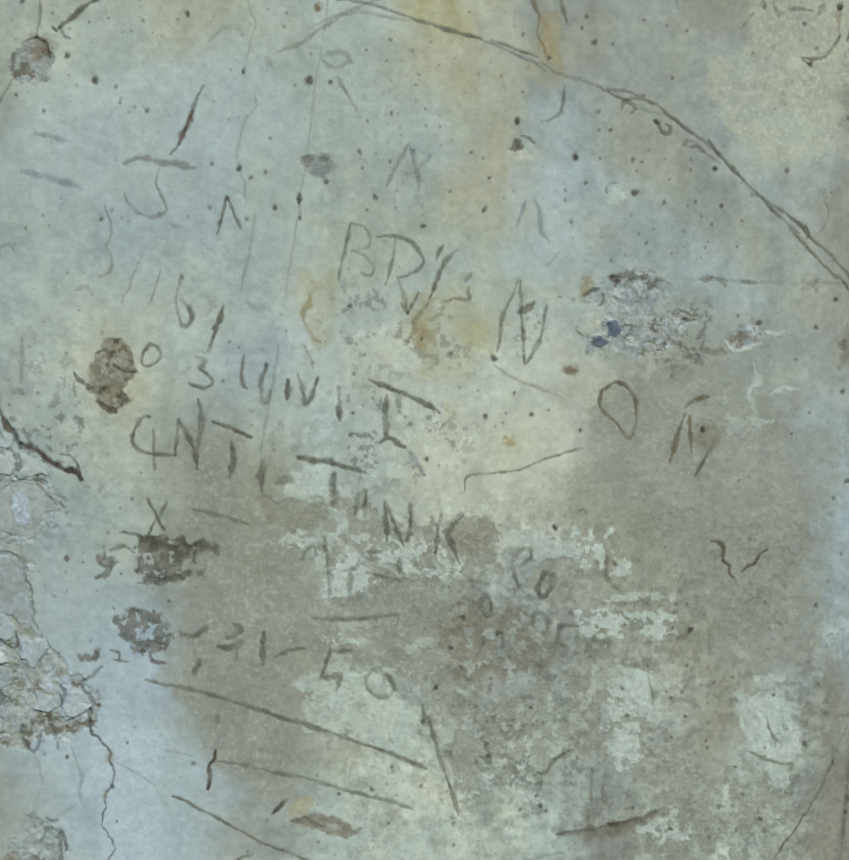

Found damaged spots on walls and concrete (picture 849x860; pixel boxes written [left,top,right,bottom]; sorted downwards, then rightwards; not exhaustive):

spalling [9,38,54,84]
spalling [578,268,695,358]
spalling [74,338,137,414]
crack [0,410,83,481]
spalling [0,416,101,750]
spalling [95,554,117,579]
spalling [124,535,218,586]
spalling [113,608,171,664]
crack [89,708,116,860]
damp [811,673,849,860]